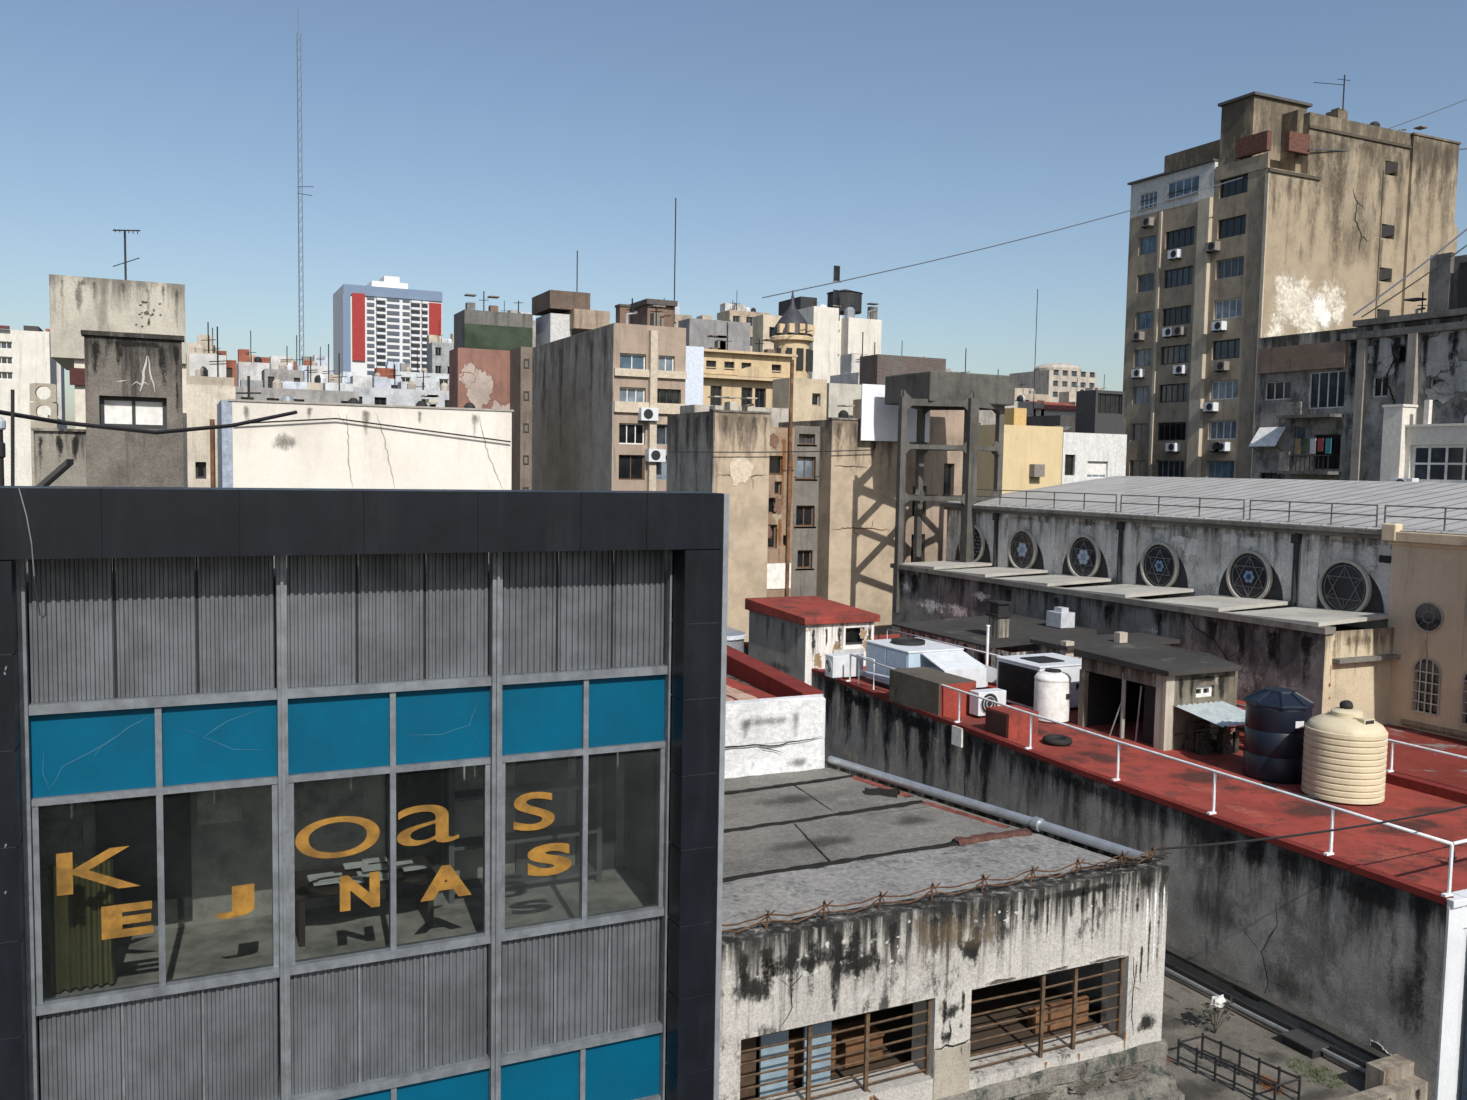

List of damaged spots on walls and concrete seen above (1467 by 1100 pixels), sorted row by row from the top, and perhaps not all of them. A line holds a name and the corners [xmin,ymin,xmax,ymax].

leakage [92,339,179,408]
peeling [458,362,510,410]
flaking render [1257,275,1348,374]
spalling [1367,337,1401,378]
spalling [1420,330,1467,404]
leakage [39,436,78,458]
leakage [826,681,992,803]
leakage [723,921,903,1011]
leakage [931,914,981,966]
leakage [1011,877,1165,981]
leakage [941,993,965,1044]
leakage [1138,1014,1155,1031]